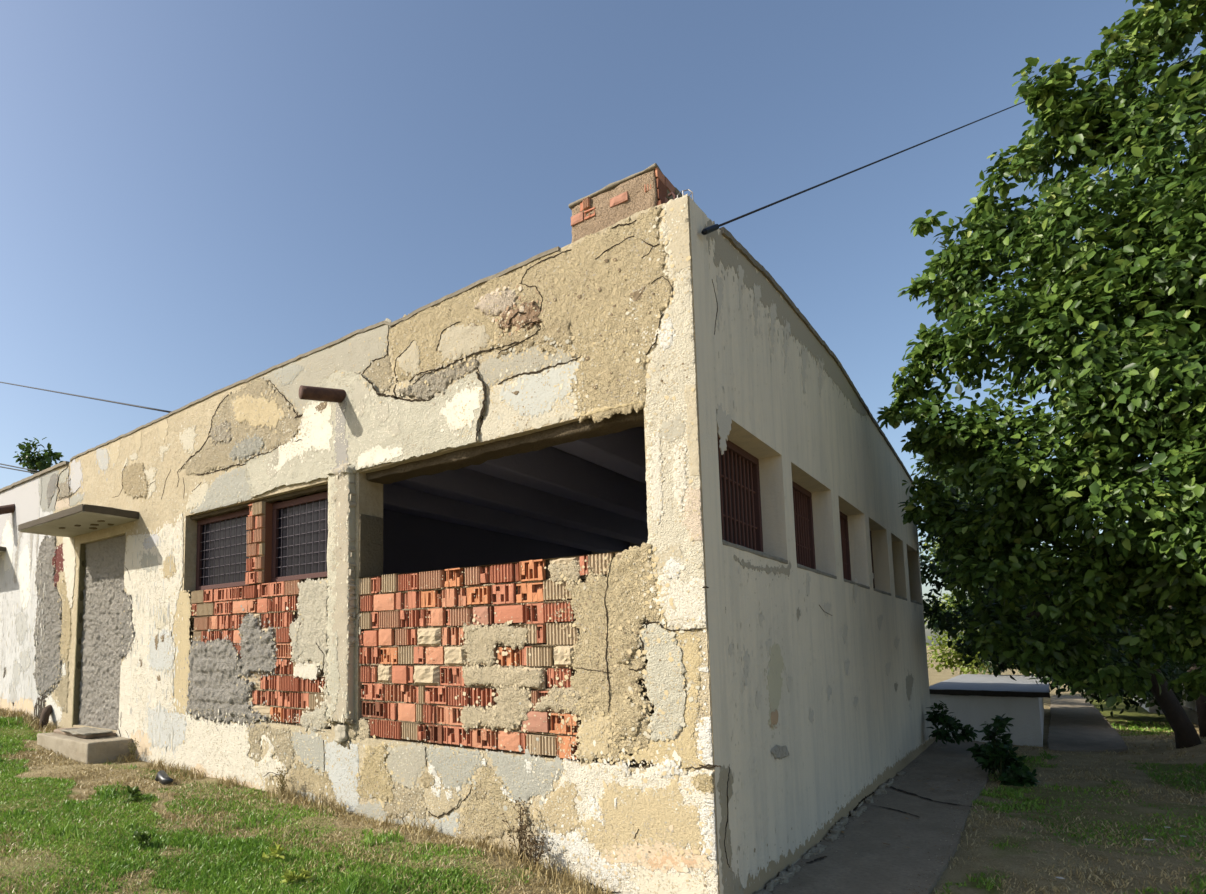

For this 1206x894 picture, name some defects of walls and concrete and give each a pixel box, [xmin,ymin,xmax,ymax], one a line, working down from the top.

crack [361,220,673,441]
spalling [1,520,76,722]
spalling [116,167,744,894]
crack [575,556,701,712]